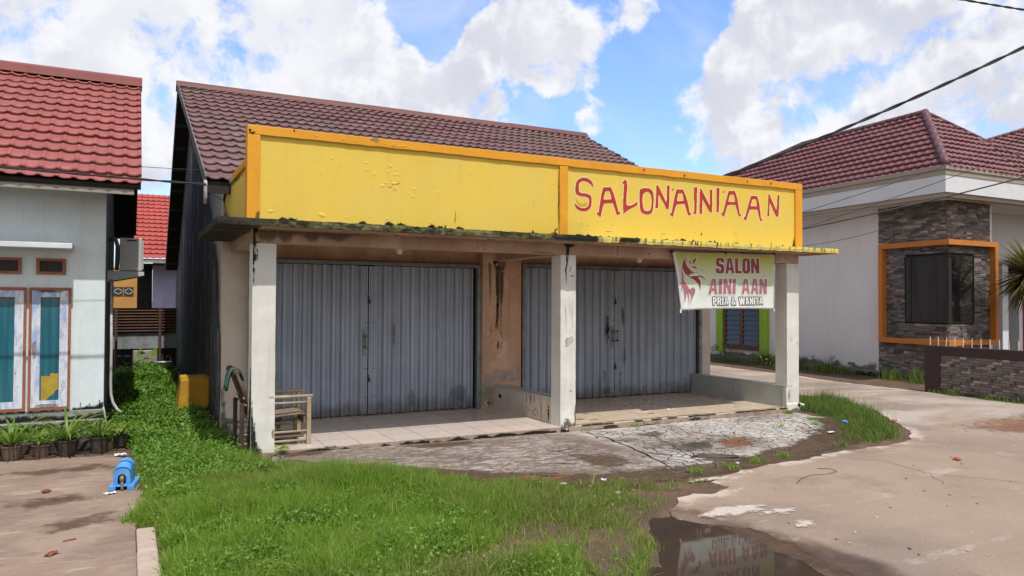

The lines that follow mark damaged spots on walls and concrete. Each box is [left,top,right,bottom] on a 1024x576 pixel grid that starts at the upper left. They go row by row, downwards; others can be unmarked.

leakage [489,261,505,301]
crack [552,176,618,285]